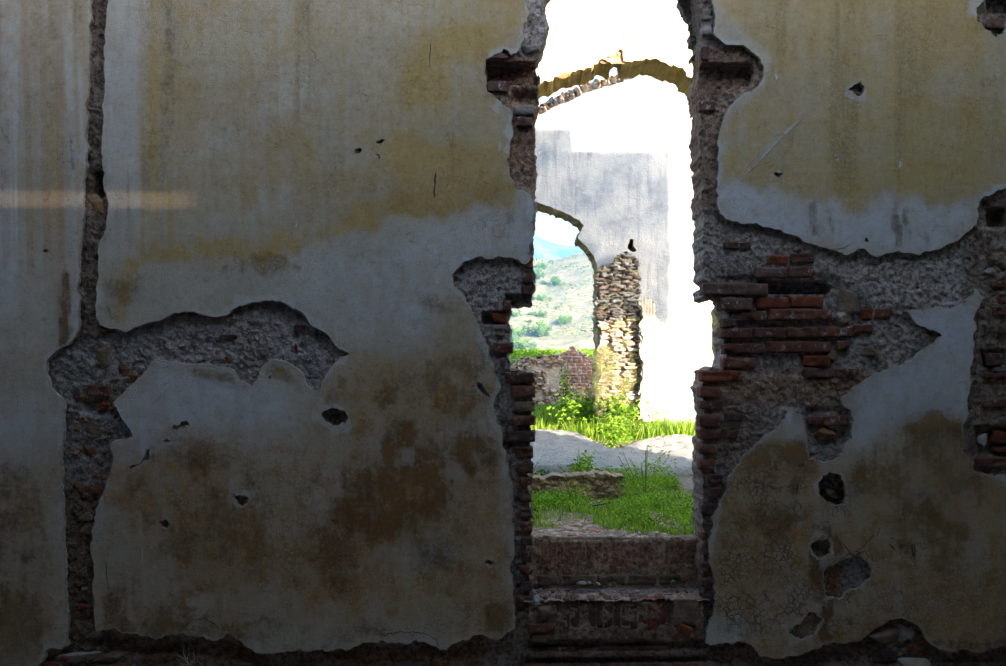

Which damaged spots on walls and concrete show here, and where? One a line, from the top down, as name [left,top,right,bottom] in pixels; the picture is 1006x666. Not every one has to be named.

crack [709,0,1006,258]
crack [38,0,536,666]
flaking render [322,408,348,425]
damp [314,419,497,592]
spalling [453,0,1006,666]
crack [704,289,1006,659]
spalling [41,628,530,666]